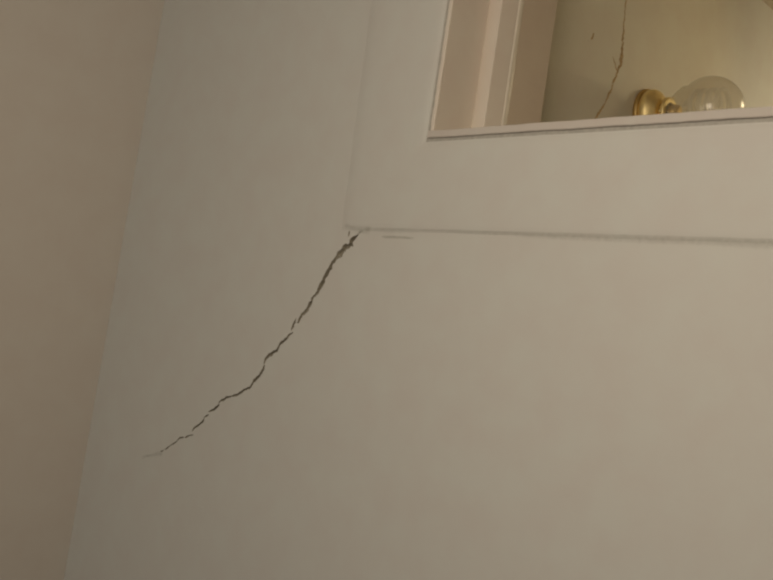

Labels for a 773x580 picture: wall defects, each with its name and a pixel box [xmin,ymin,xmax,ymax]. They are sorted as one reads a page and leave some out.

crack [427,0,773,142]
crack [160,231,358,452]